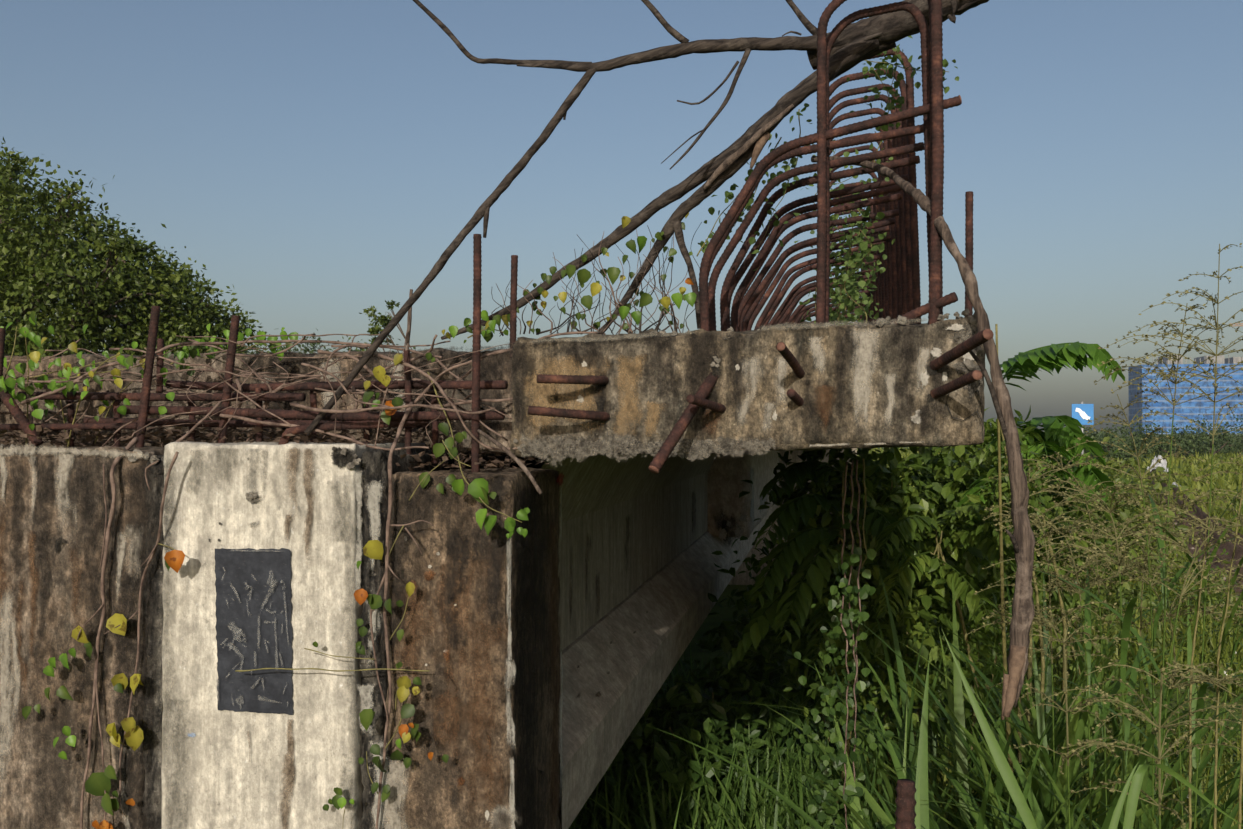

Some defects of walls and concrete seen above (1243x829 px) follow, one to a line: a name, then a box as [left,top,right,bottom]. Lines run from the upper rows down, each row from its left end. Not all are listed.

leakage [244,347,456,430]
leakage [480,331,786,437]
spalling [513,384,775,464]
leakage [805,326,943,436]
leakage [0,453,188,829]
leakage [333,469,563,829]